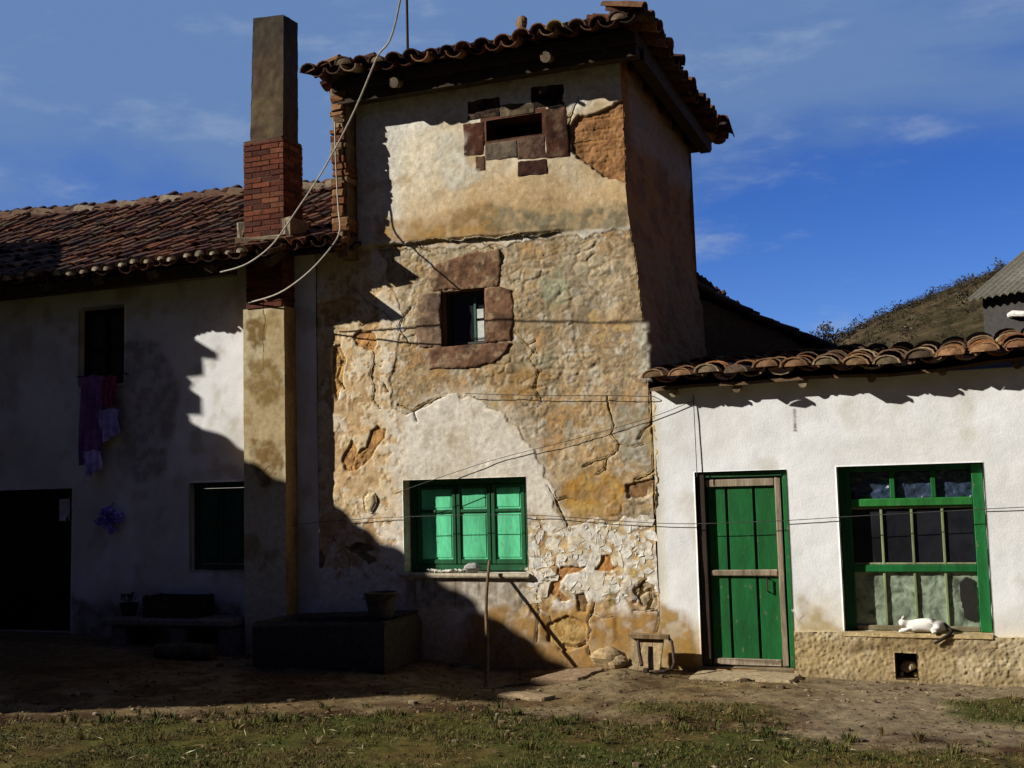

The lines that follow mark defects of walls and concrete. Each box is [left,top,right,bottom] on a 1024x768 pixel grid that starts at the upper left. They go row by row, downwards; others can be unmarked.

water stain [379,221,399,239]
water stain [412,205,499,240]
water stain [246,319,264,347]
spalling [323,297,360,326]
spalling [353,330,377,351]
water stain [248,360,281,405]
spalling [333,345,346,400]
spalling [343,427,386,471]
crack [583,394,658,513]
crack [547,485,576,531]
flaking render [521,515,658,649]